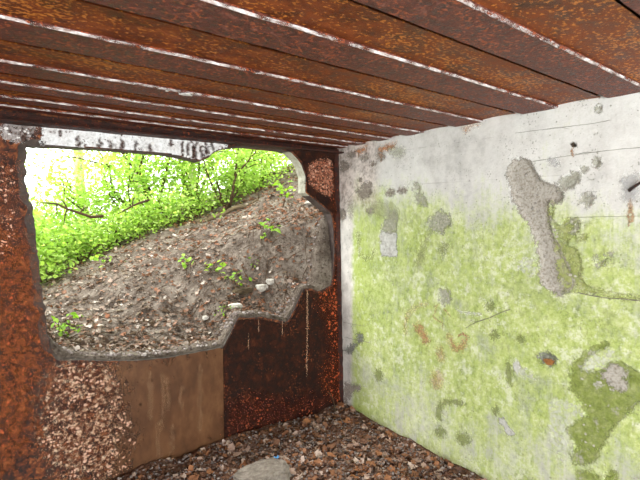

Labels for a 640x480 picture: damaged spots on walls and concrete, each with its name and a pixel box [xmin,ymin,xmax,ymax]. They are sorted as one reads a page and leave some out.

spalling [505,156,628,301]
corrosion [100,149,344,479]
damp [436,399,466,421]